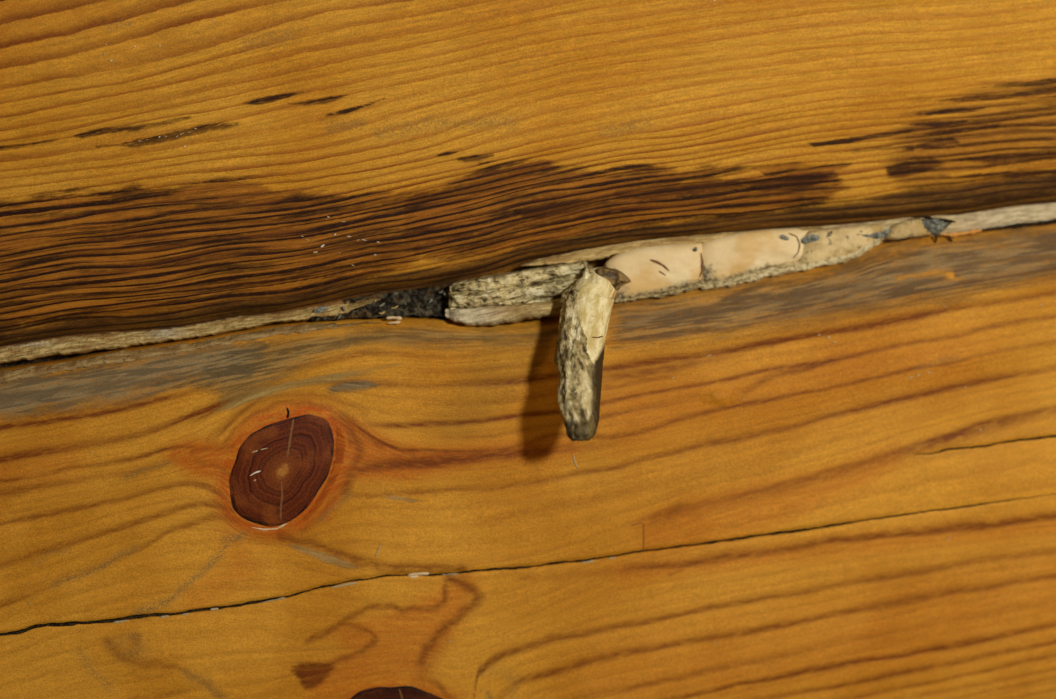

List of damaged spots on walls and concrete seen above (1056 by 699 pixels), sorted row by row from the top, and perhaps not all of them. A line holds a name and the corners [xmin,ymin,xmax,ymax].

crack [916,435,1056,455]
crack [0,493,1056,639]